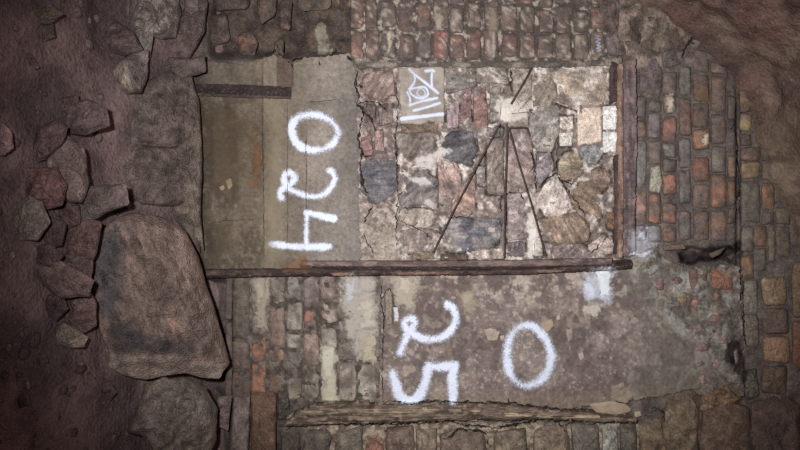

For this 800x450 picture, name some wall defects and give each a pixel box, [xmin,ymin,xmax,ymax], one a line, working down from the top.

crack [210,44,433,253]
leakage [629,227,658,258]
spalling [662,241,741,264]
leakage [582,267,616,317]